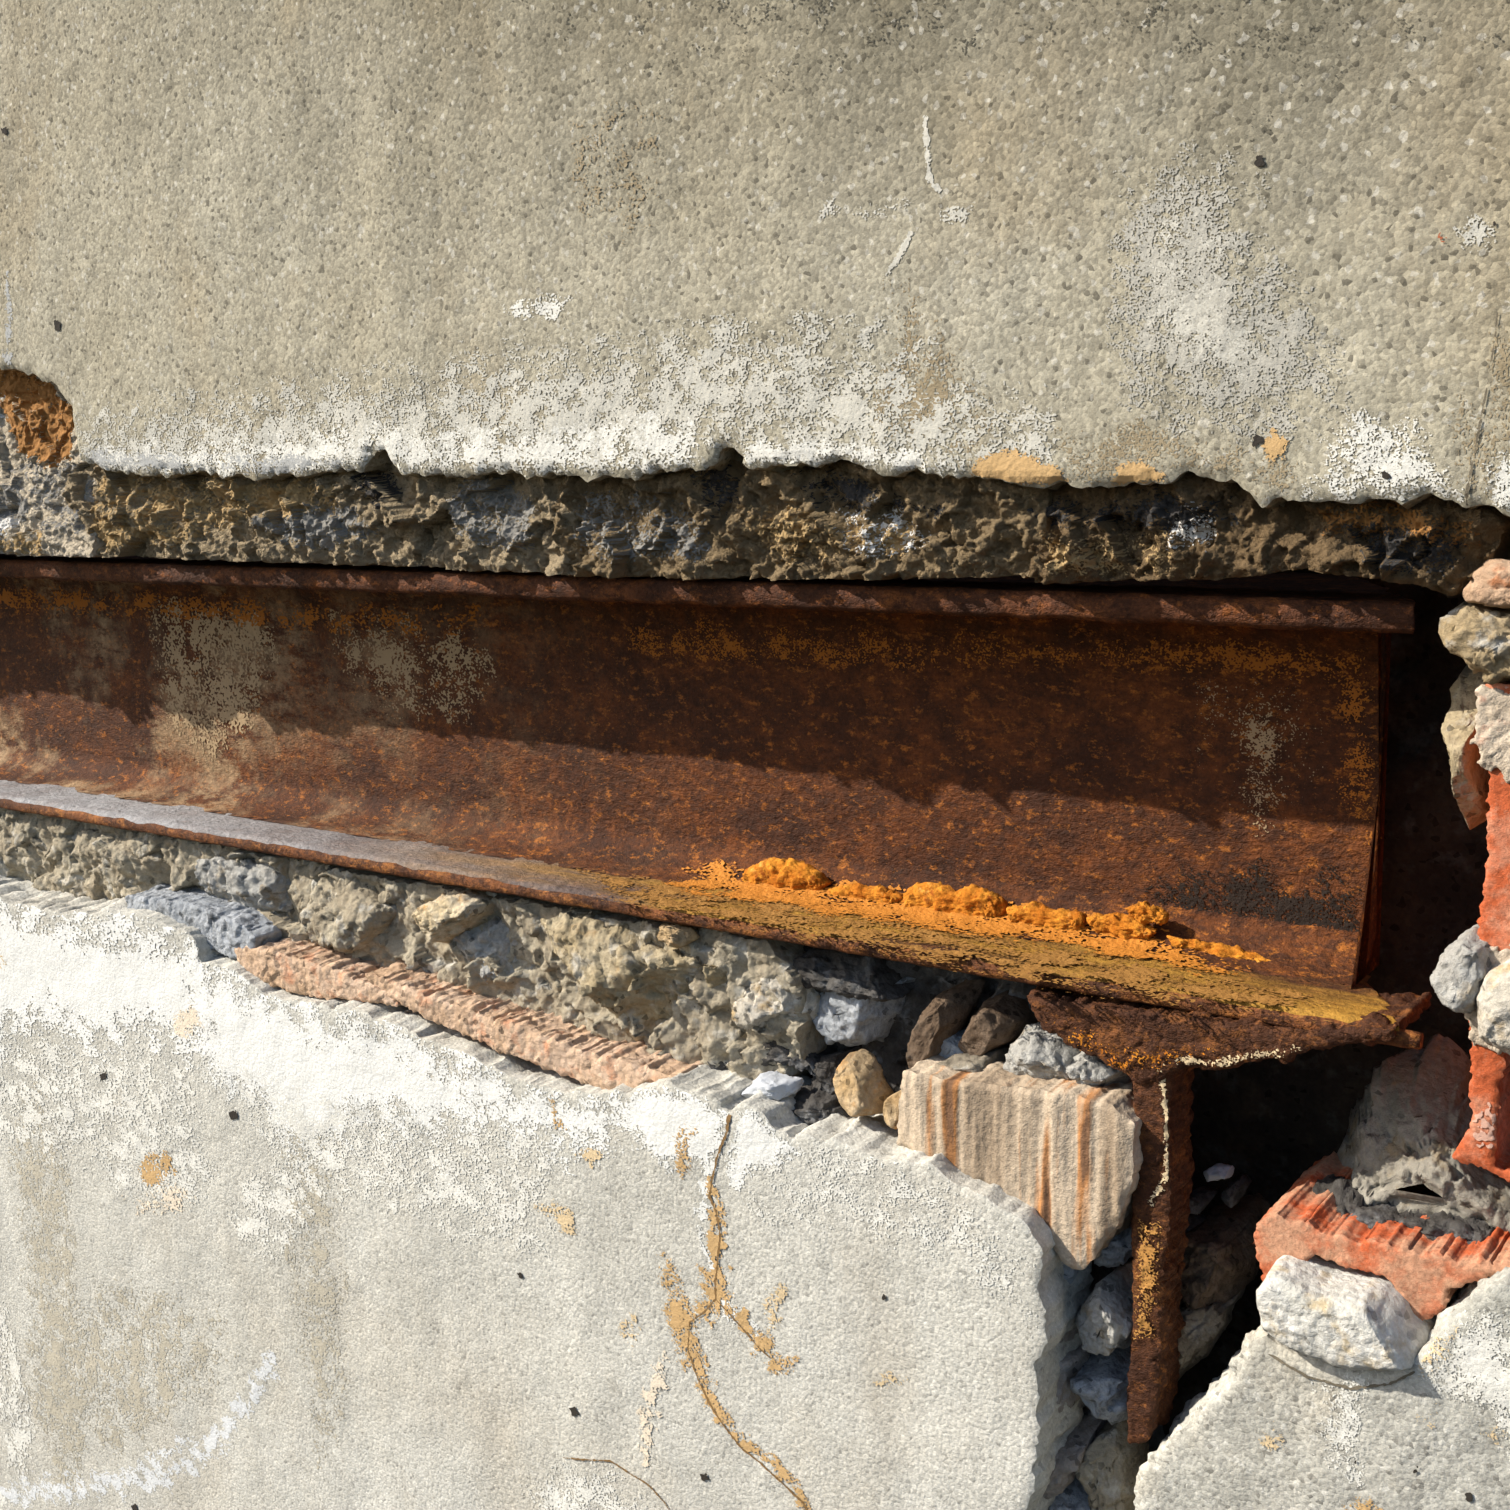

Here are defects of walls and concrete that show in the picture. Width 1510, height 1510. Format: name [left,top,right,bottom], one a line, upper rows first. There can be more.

damp [0,0,1510,580]
spalling [0,374,1510,596]
rust [734,497,914,570]
rust [1039,530,1197,580]
rust [626,617,1383,845]
rust [0,799,1348,1030]
peeling [0,899,806,1260]
rust [1068,1025,1220,1070]
damp [0,1030,563,1510]
crack [687,1114,808,1510]
rust [1133,1219,1163,1339]
spalling [1133,1250,1510,1510]